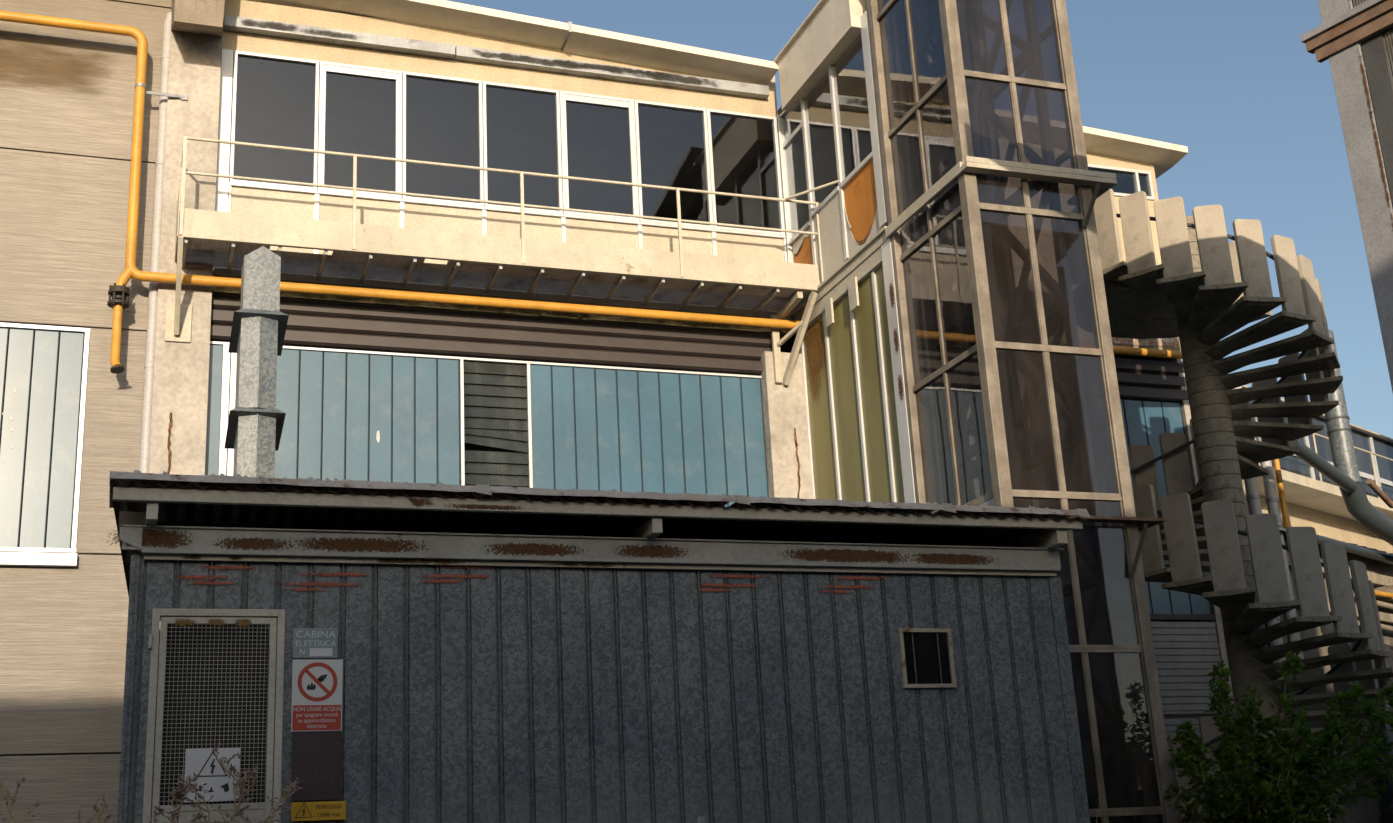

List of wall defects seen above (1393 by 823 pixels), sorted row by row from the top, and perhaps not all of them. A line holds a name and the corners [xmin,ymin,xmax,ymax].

water stain [0,33,88,85]
corrosion [107,529,201,559]
corrosion [213,537,463,564]
corrosion [484,543,689,567]
corrosion [779,548,998,565]